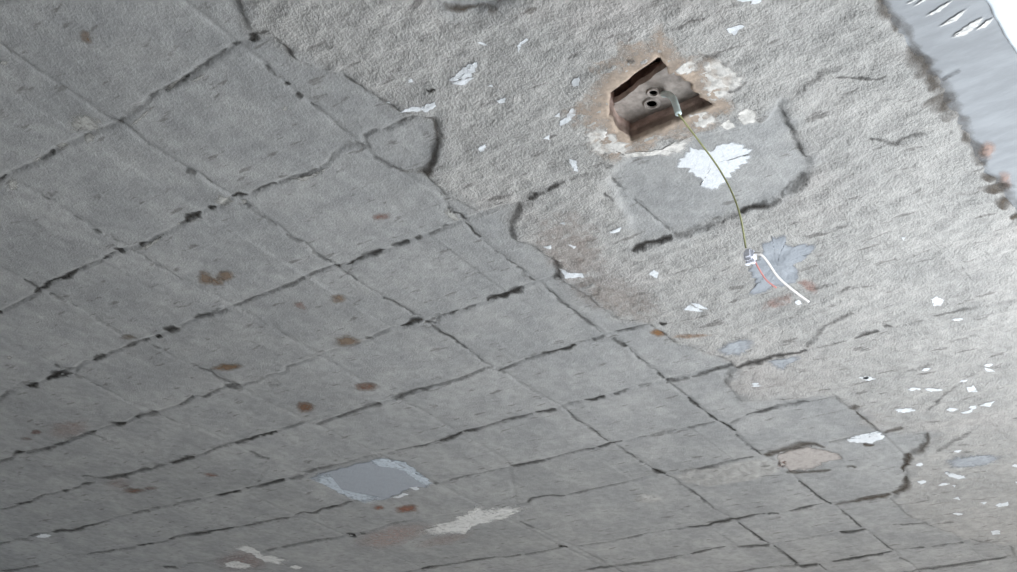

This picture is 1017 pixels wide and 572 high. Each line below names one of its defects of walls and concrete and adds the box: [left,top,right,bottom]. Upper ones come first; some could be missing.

spalling [555,32,730,157]
peeling [677,142,752,190]
crack [180,182,277,224]
crack [723,201,778,222]
crack [632,235,673,252]
crack [335,236,421,280]
rust [200,272,232,285]
peeling [559,268,584,279]
rust [338,337,356,346]
crack [386,260,929,567]
peeling [847,431,885,444]
spalling [777,447,842,471]